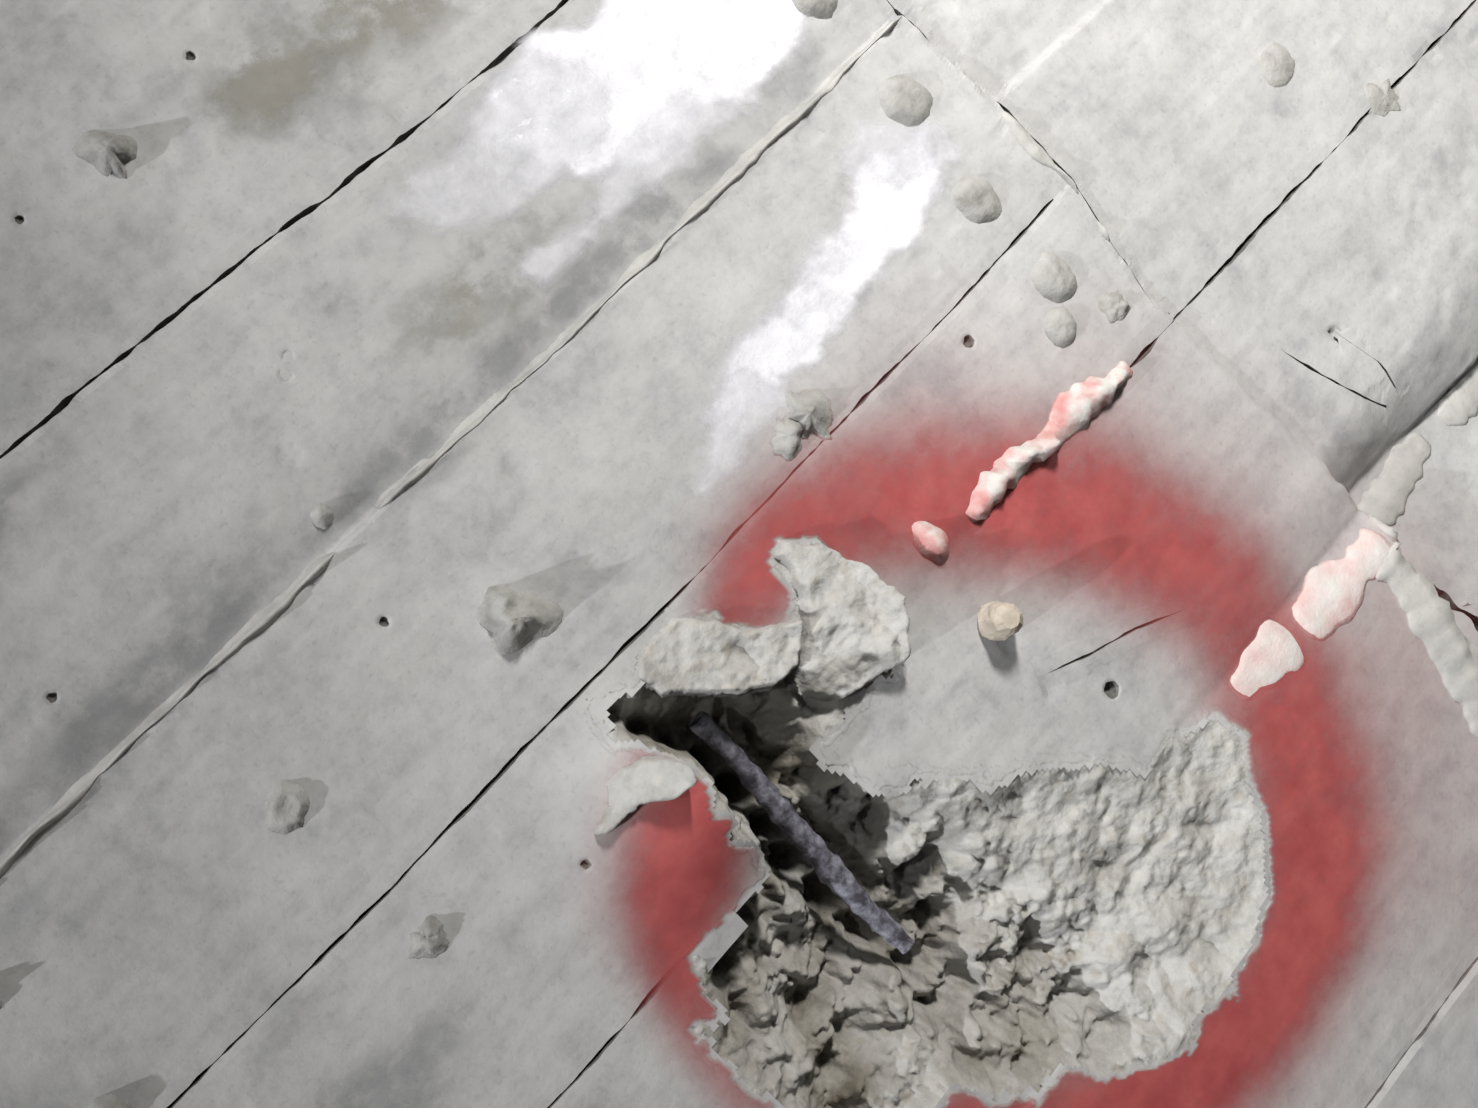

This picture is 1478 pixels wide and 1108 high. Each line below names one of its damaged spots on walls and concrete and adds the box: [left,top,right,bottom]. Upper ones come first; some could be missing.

crack [0,0,602,494]
leakage [405,0,806,281]
crack [861,0,1478,404]
crack [1266,326,1415,437]
crack [137,178,1071,1108]
spalling [558,535,1276,1108]
crack [1031,604,1189,698]